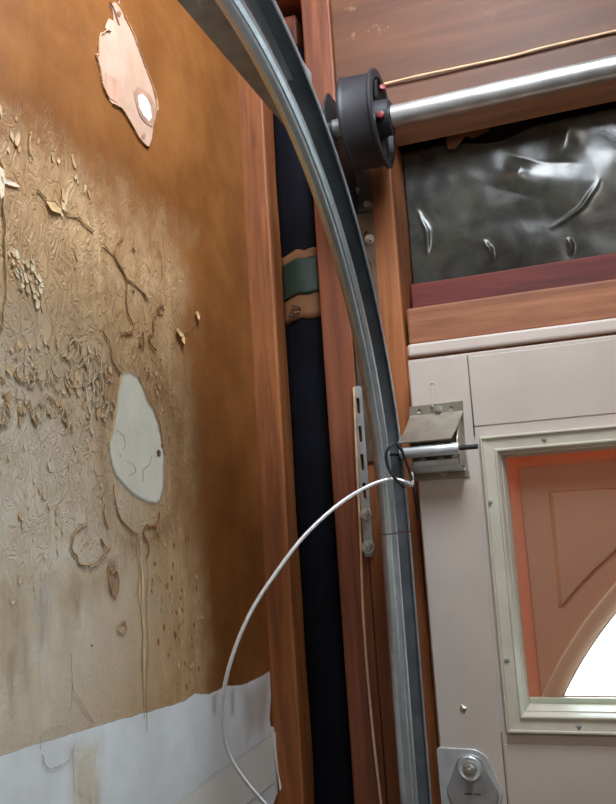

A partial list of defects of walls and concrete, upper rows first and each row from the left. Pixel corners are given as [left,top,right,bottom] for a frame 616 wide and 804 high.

spalling [95,0,159,148]
peeling [46,188,79,217]
peeling [8,249,44,310]
spalling [0,335,174,502]
crack [71,485,160,715]